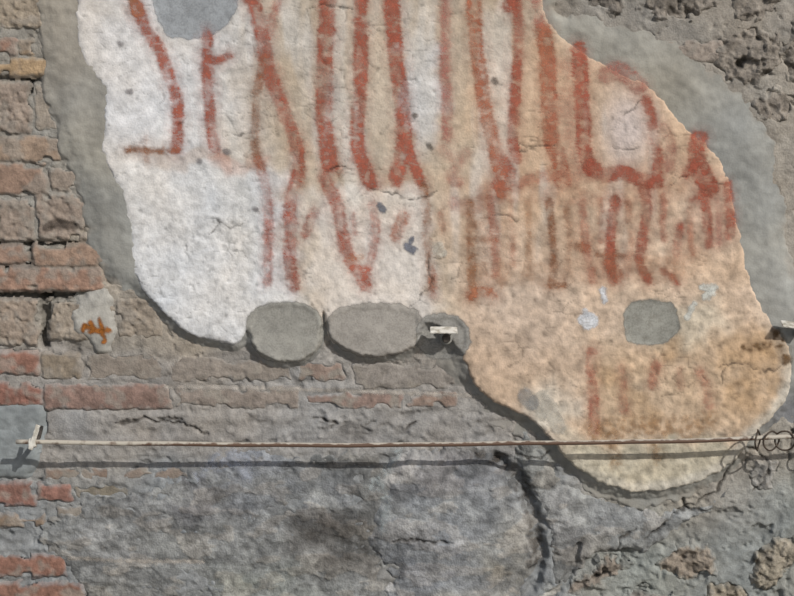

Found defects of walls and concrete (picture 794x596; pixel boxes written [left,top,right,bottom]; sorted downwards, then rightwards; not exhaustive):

spalling [578,308,598,330]